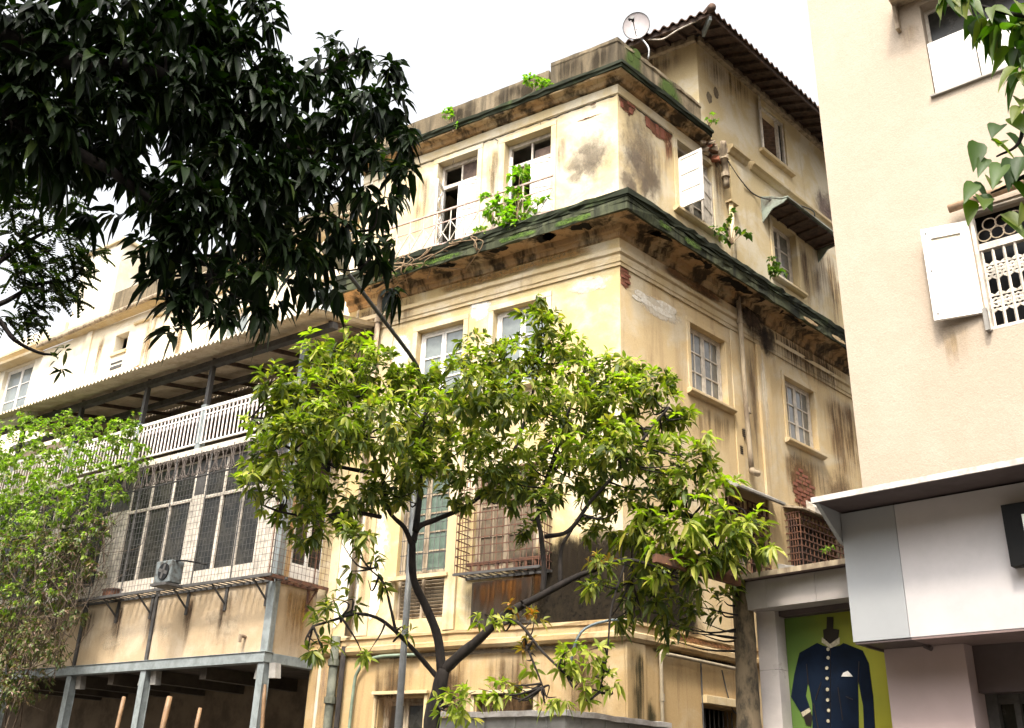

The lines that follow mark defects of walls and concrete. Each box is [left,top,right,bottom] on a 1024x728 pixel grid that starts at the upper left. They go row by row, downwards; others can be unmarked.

spalling [619,92,673,143]
leakage [584,143,605,169]
leakage [623,132,658,196]
leakage [536,233,557,243]
leakage [646,230,672,242]
leakage [443,249,585,291]
peeling [570,267,678,323]
leakage [666,266,720,302]
spalling [790,463,815,508]
leakage [636,658,656,721]